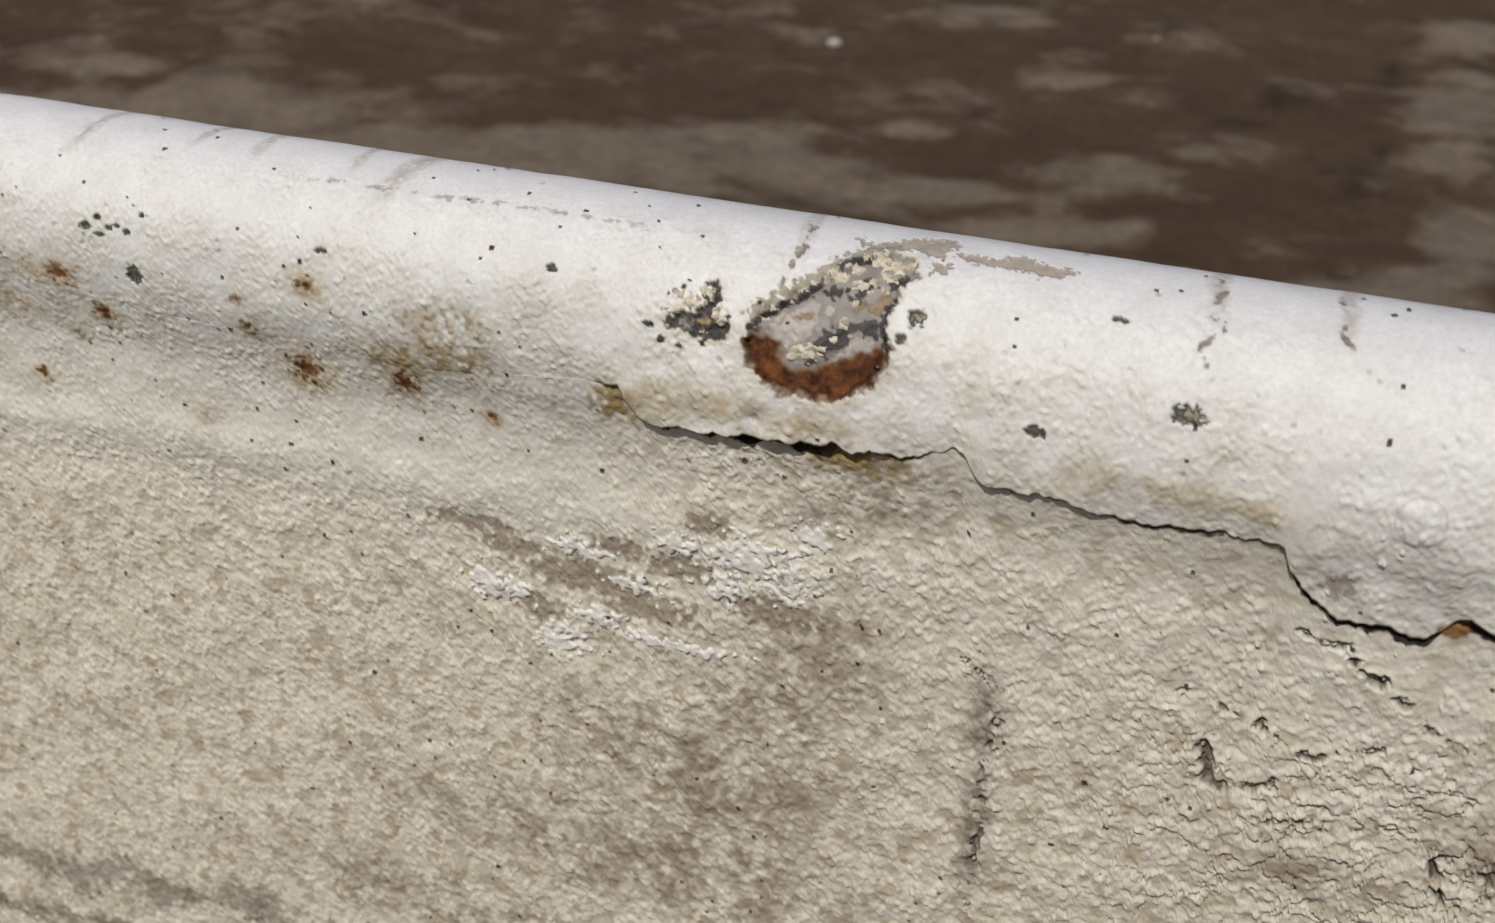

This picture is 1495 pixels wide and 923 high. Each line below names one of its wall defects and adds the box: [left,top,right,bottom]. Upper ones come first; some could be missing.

rust [285,344,329,387]
rust [372,324,475,390]
peeling [642,237,1081,402]
crack [589,384,923,479]
crack [963,455,1495,755]